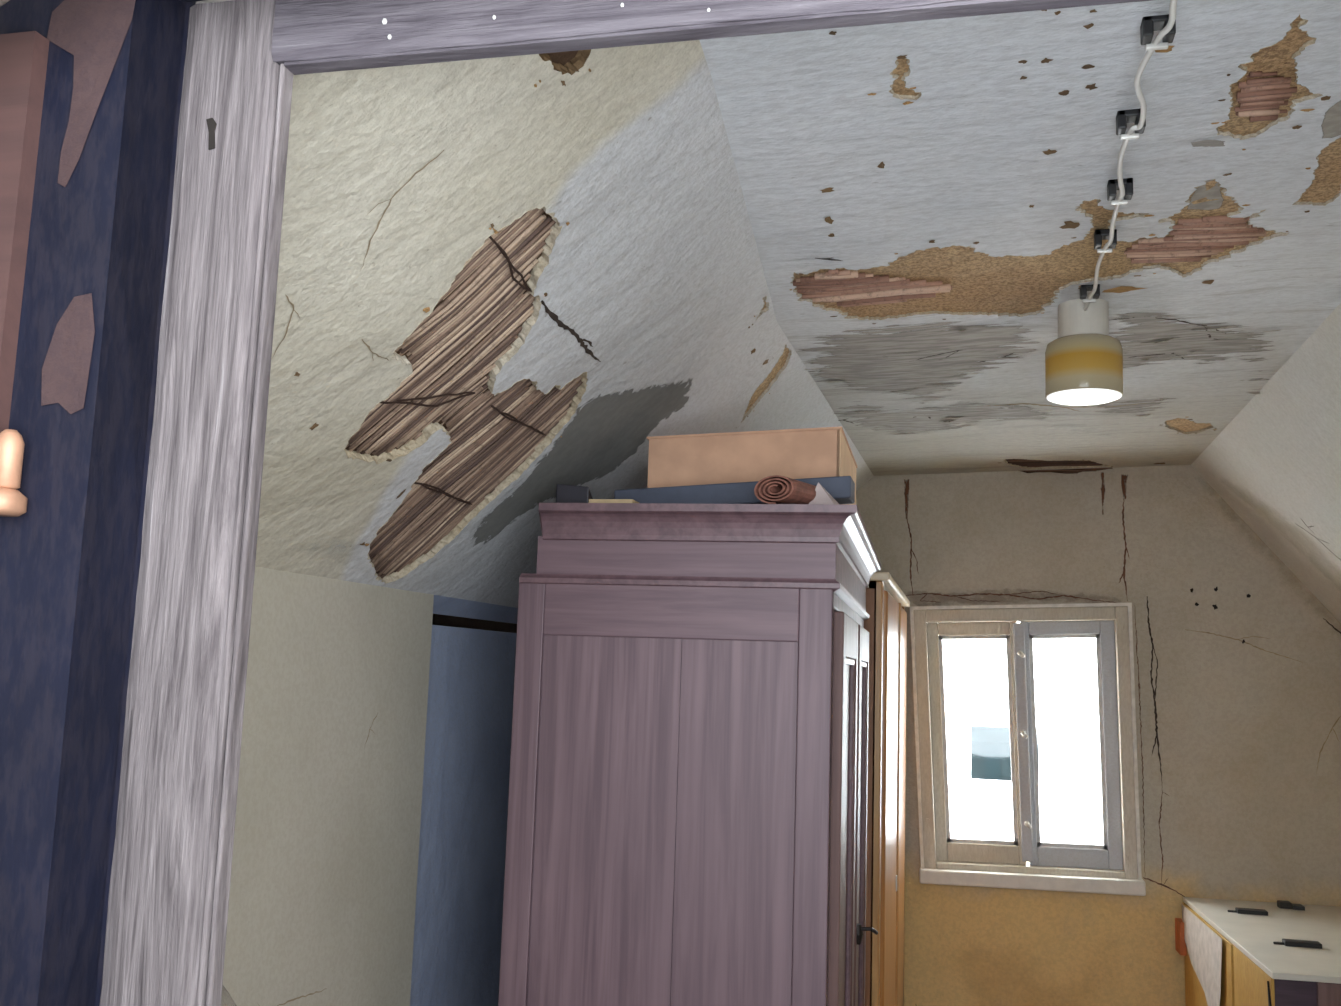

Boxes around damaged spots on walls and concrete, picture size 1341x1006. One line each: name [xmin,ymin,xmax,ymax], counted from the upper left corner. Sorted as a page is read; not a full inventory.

crack [360,150,444,271]
flaking render [344,207,588,584]
peeling [539,49,591,86]
crack [541,300,601,362]
peeling [867,55,921,105]
flaking render [741,173,1288,434]
flaking render [1211,15,1341,213]
crack [906,498,1185,897]